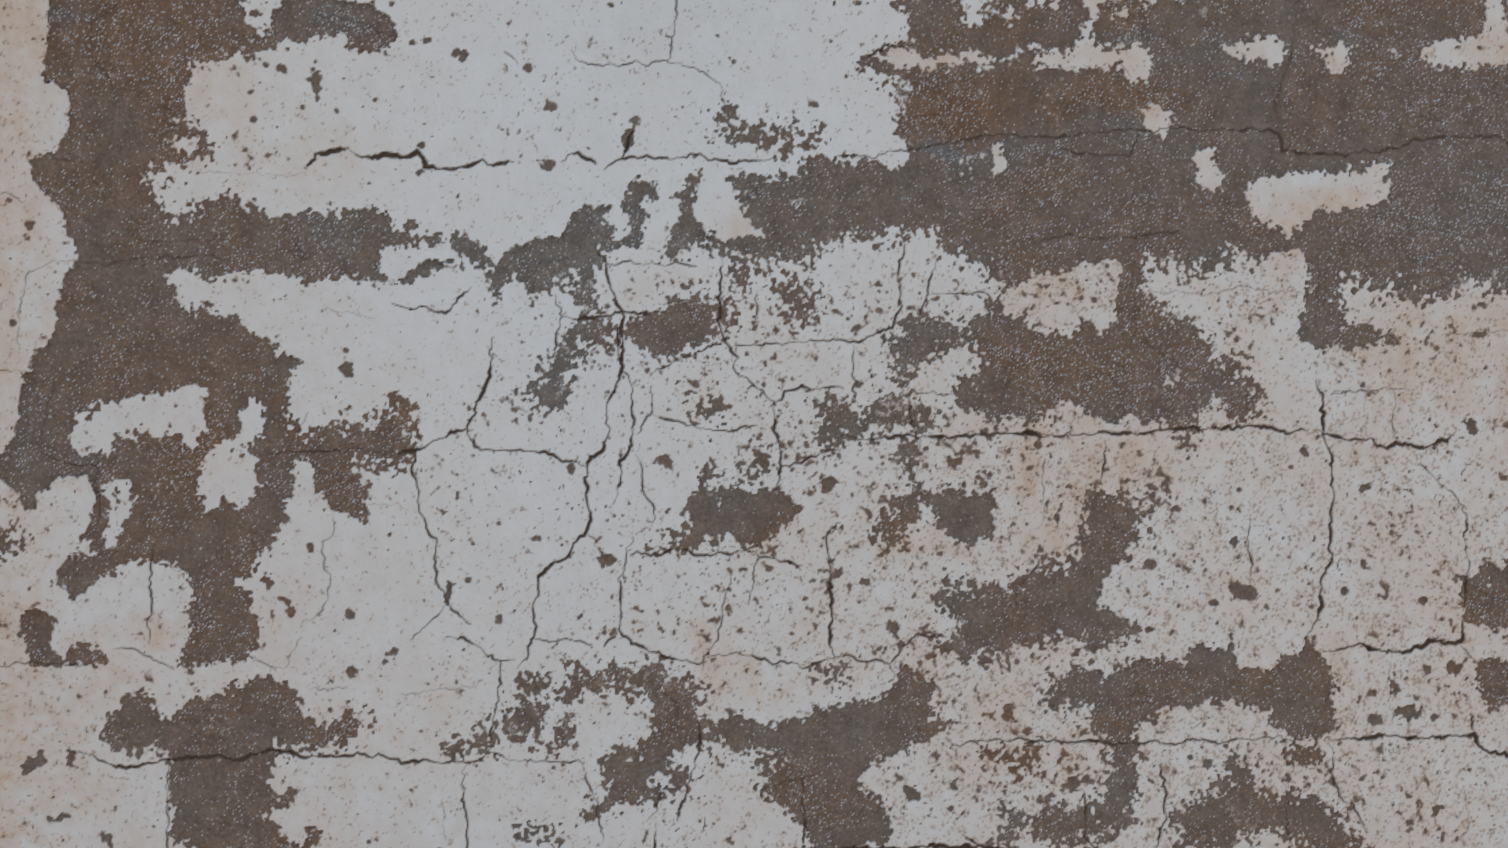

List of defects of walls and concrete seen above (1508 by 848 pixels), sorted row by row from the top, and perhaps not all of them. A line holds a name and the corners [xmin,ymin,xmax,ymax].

crack [503,50,520,66]
crack [570,0,727,114]
crack [197,145,515,178]
crack [559,129,778,170]
crack [0,253,231,373]
peeling [0,0,1508,677]
crack [72,223,1508,848]
crack [0,540,173,670]
spalling [346,666,359,680]
peeling [439,440,1508,848]
peeling [67,675,375,848]